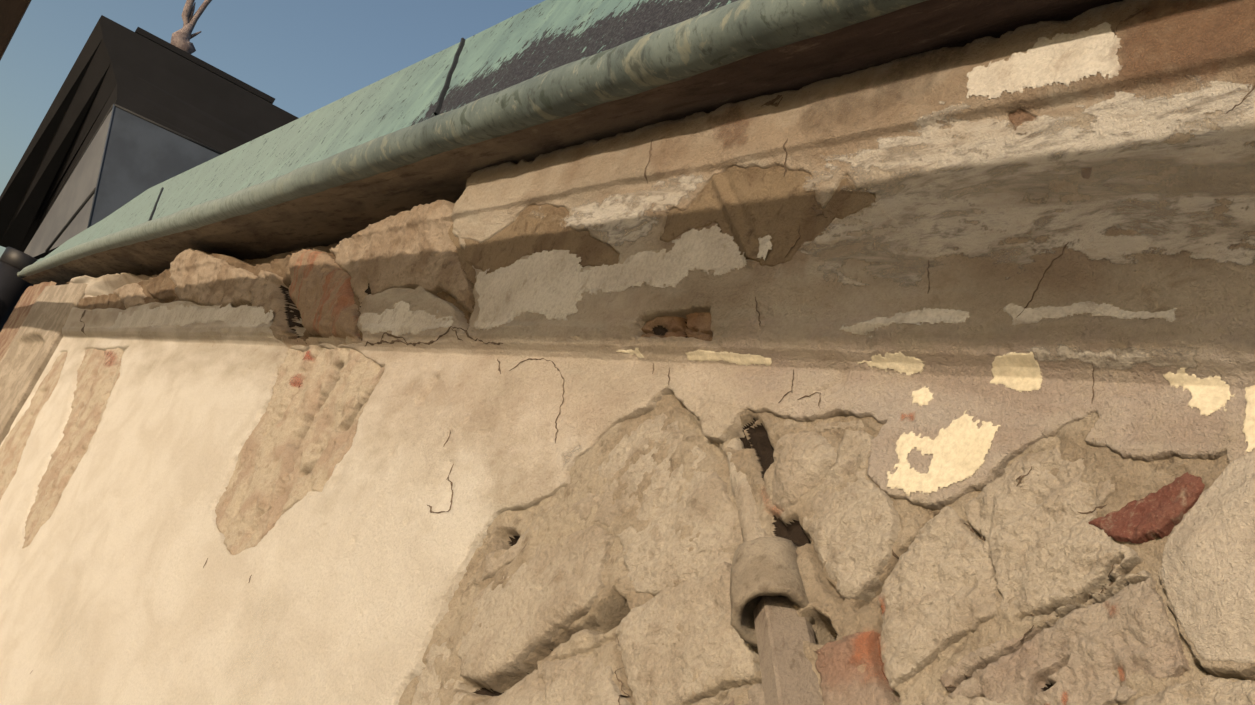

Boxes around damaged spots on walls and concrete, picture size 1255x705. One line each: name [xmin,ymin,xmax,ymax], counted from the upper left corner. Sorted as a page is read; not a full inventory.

spalling [0,348,124,549]
crack [427,432,454,513]
crack [365,326,565,443]
peeling [77,22,1255,555]
spalling [399,394,1255,705]
crack [1017,242,1069,317]